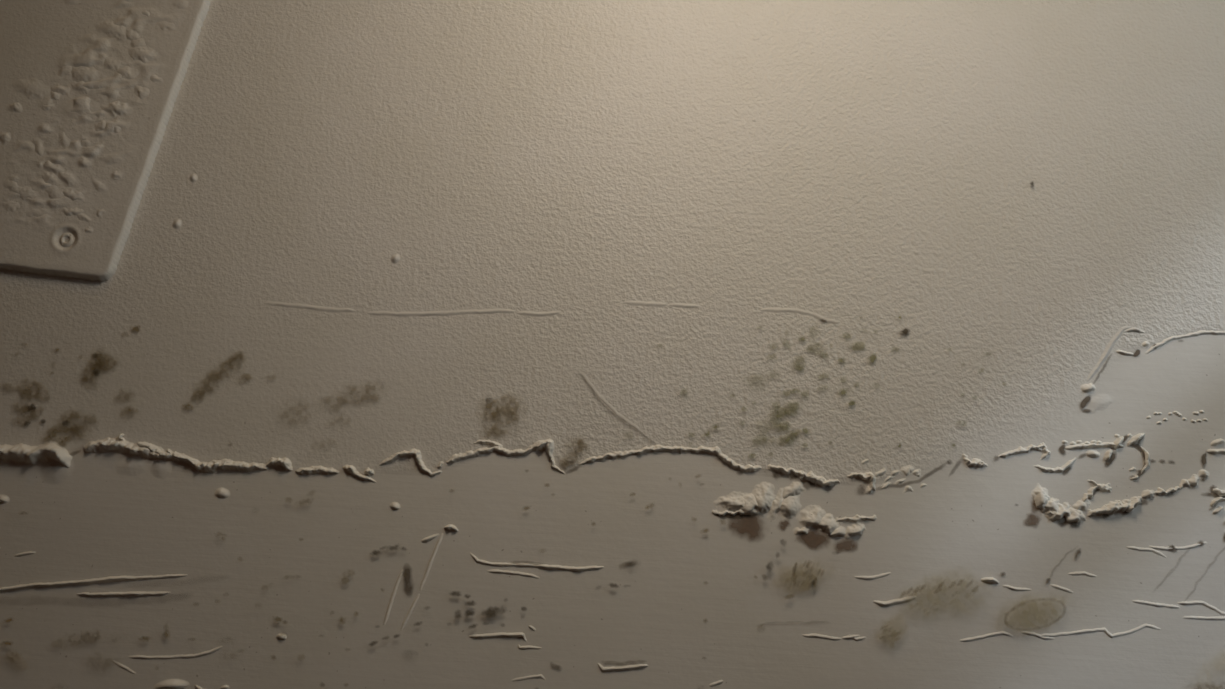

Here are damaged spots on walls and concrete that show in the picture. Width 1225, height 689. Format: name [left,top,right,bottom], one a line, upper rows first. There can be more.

damp [19,383,81,445]
peeling [1080,383,1114,413]
peeling [712,480,877,551]
peeling [1025,469,1225,527]